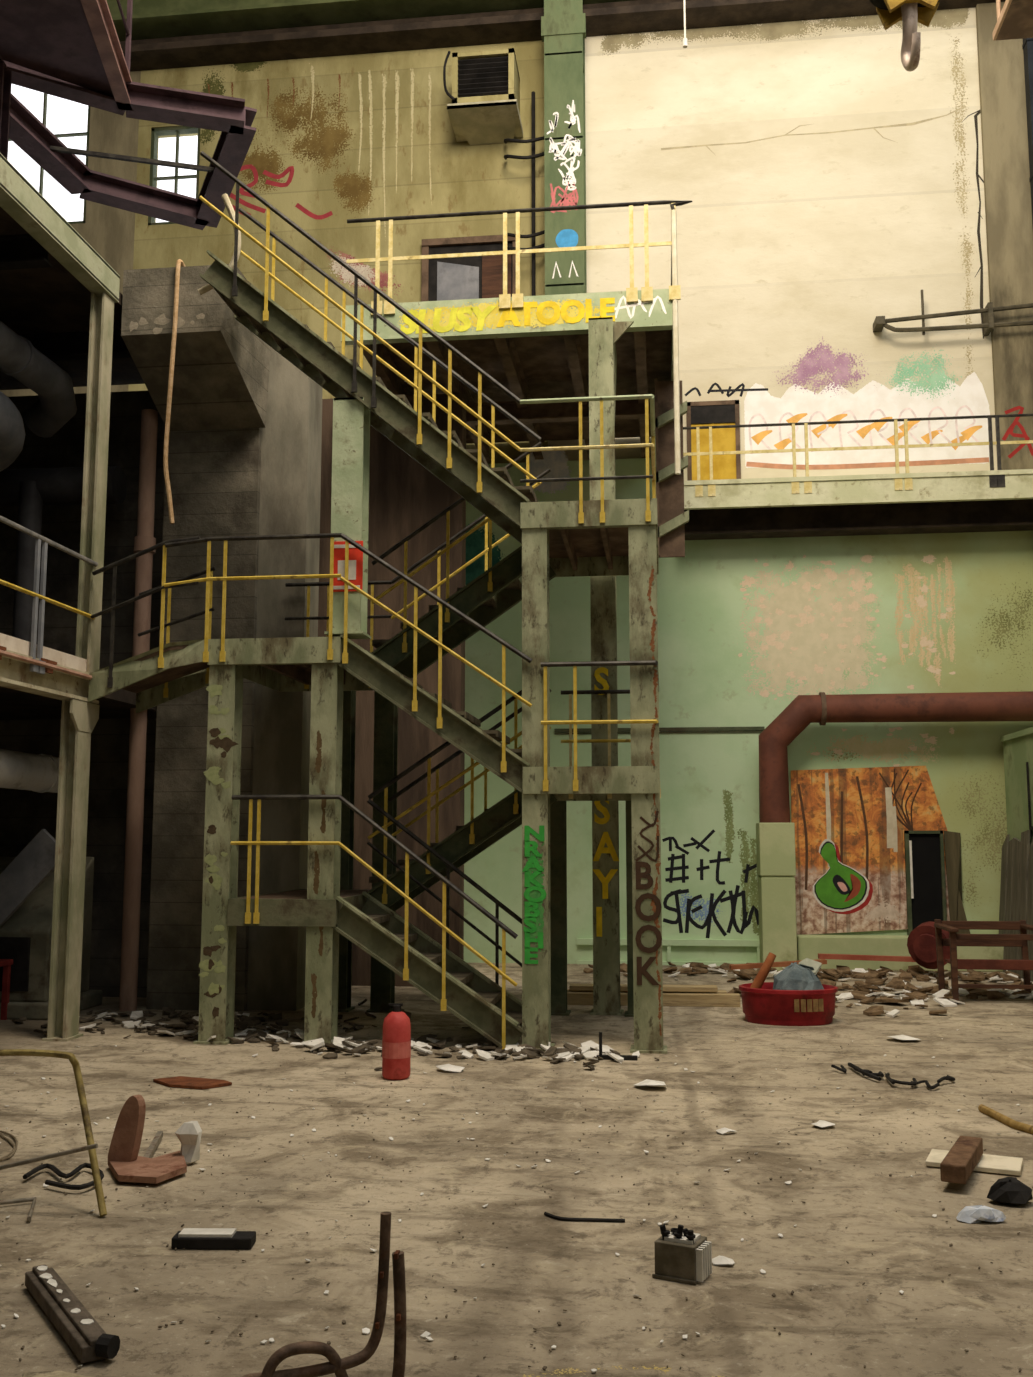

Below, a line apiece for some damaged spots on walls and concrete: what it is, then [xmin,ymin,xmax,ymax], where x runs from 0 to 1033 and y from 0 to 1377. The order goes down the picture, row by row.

water stain [238,63,432,237]
peeling [734,554,957,702]